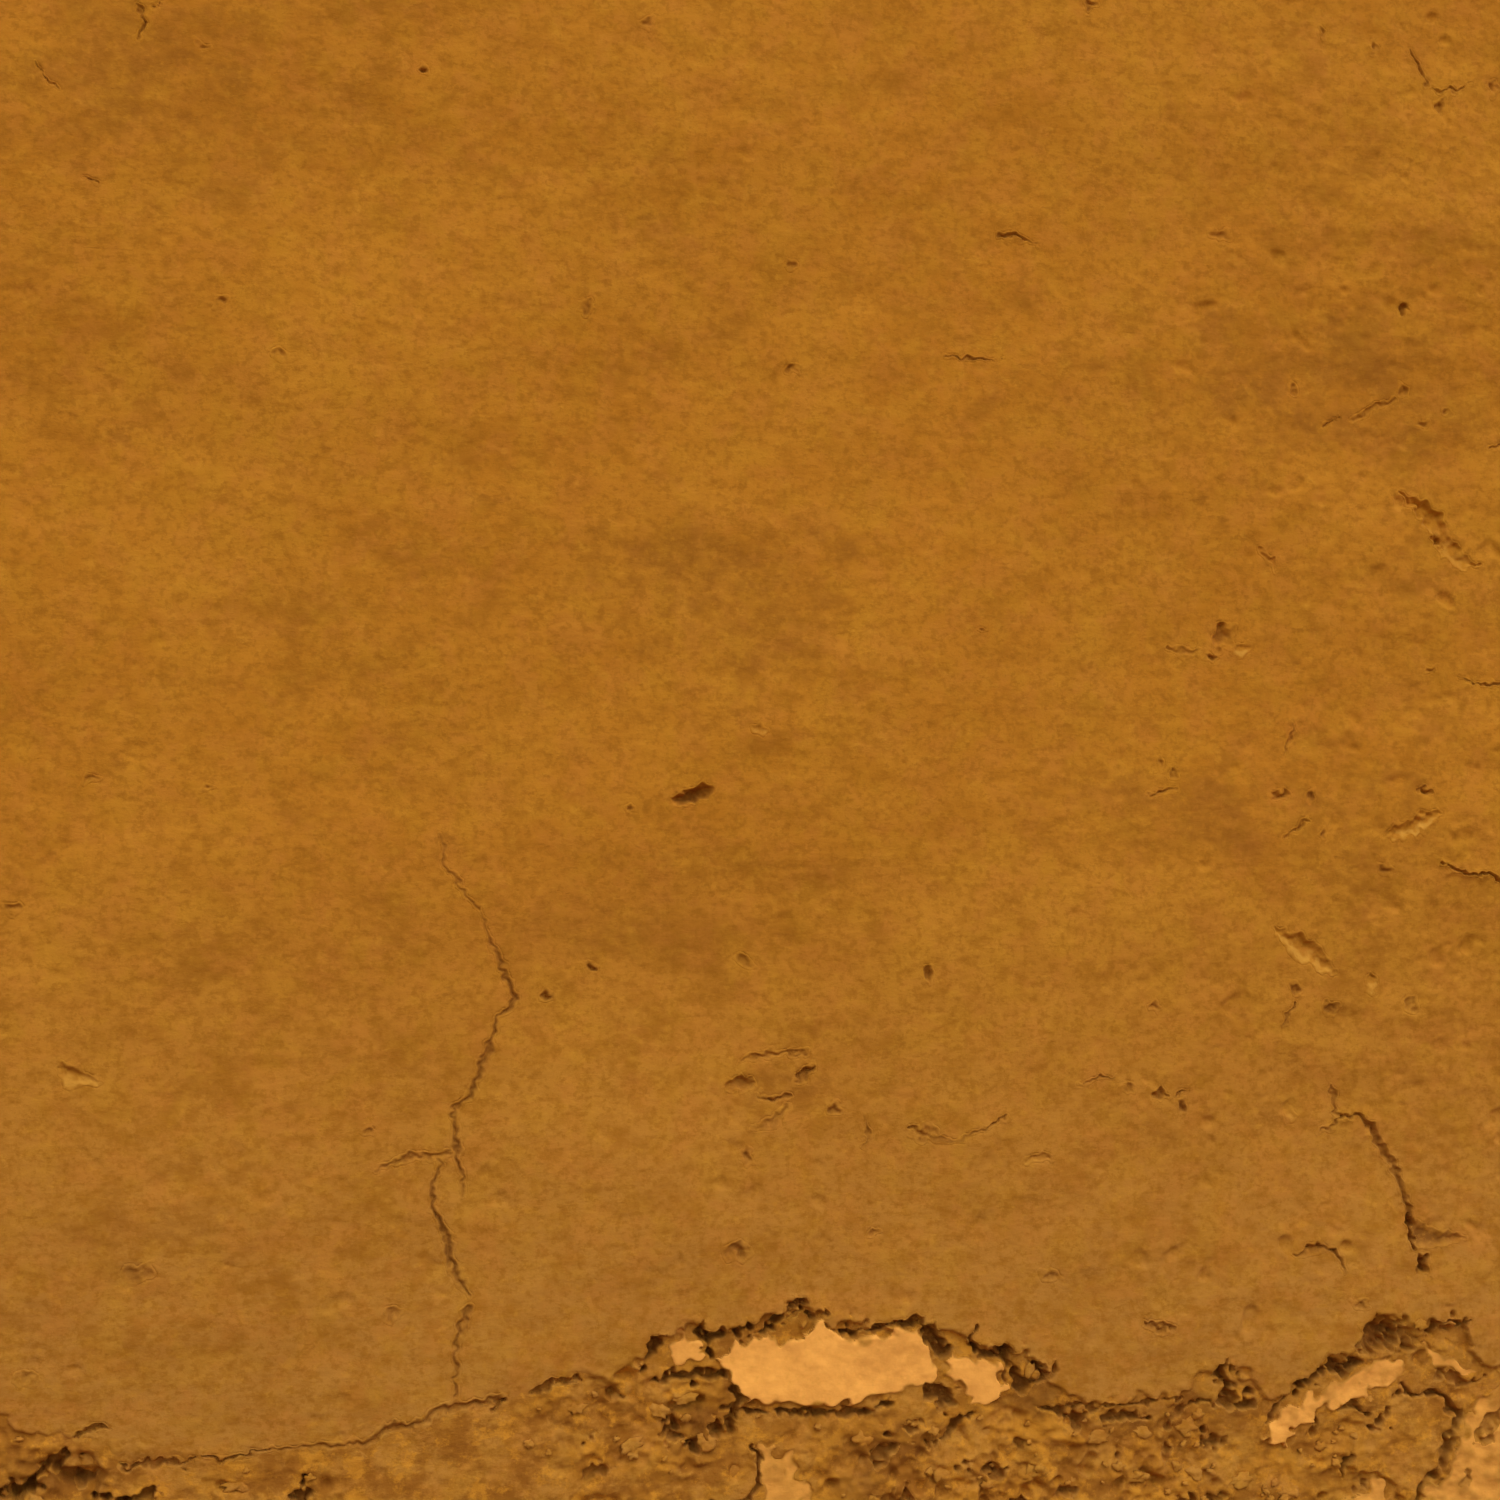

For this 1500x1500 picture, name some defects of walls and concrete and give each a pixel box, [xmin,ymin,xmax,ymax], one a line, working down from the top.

crack [174,831,521,1468]
crack [1314,1082,1469,1282]
spalling [0,1293,1500,1500]